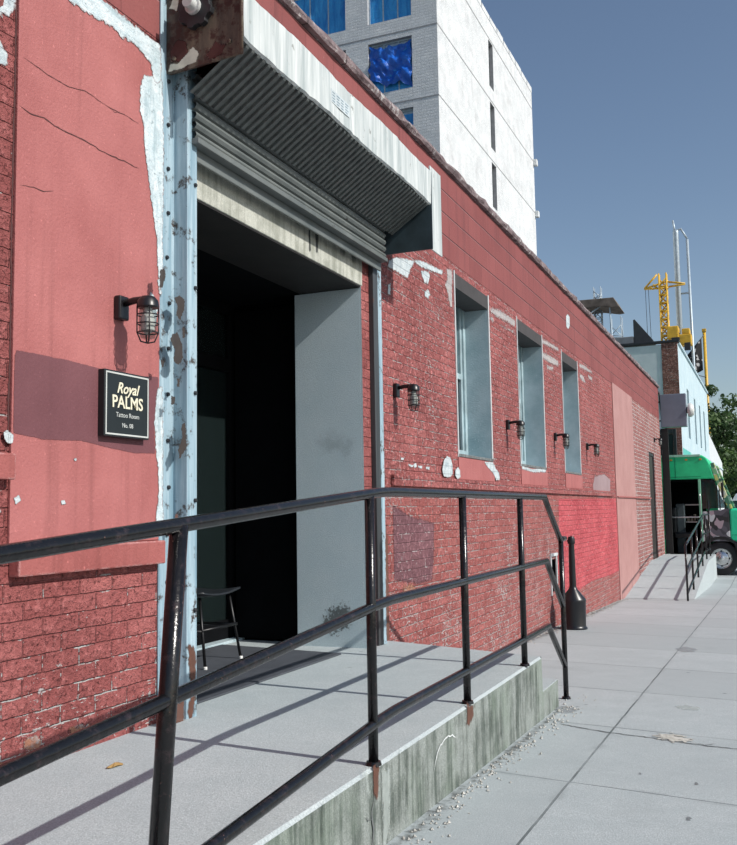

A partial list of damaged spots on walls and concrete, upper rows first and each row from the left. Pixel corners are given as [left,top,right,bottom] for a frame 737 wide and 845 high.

flaking render [0,0,16,18]
peeling [0,40,8,66]
rust [170,40,188,62]
peeling [69,0,199,296]
crack [7,0,137,450]
peeling [387,257,452,307]
rust [161,295,185,367]
peeling [154,385,164,521]
rust [178,423,186,458]
peeling [442,456,461,479]
rust [188,644,197,681]
rust [176,697,195,723]